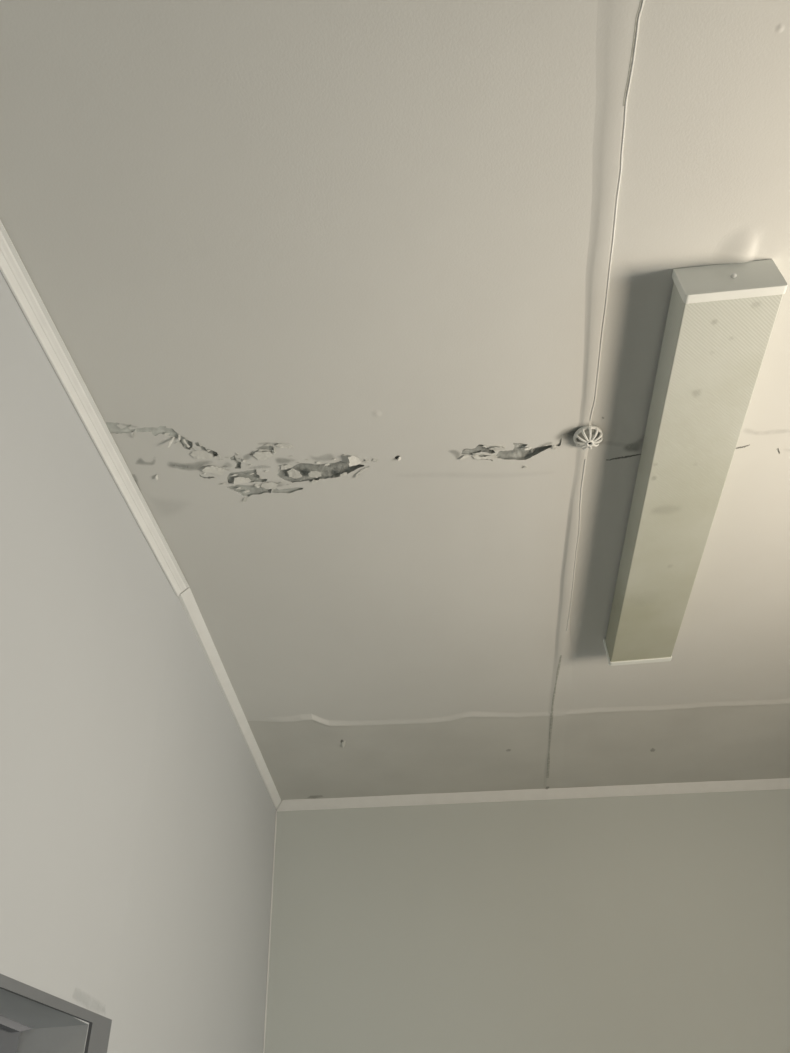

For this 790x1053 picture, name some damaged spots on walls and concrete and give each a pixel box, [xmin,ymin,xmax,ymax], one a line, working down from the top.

crack [590,0,643,421]
peeling [106,422,378,502]
peeling [460,438,562,468]
crack [546,454,641,778]